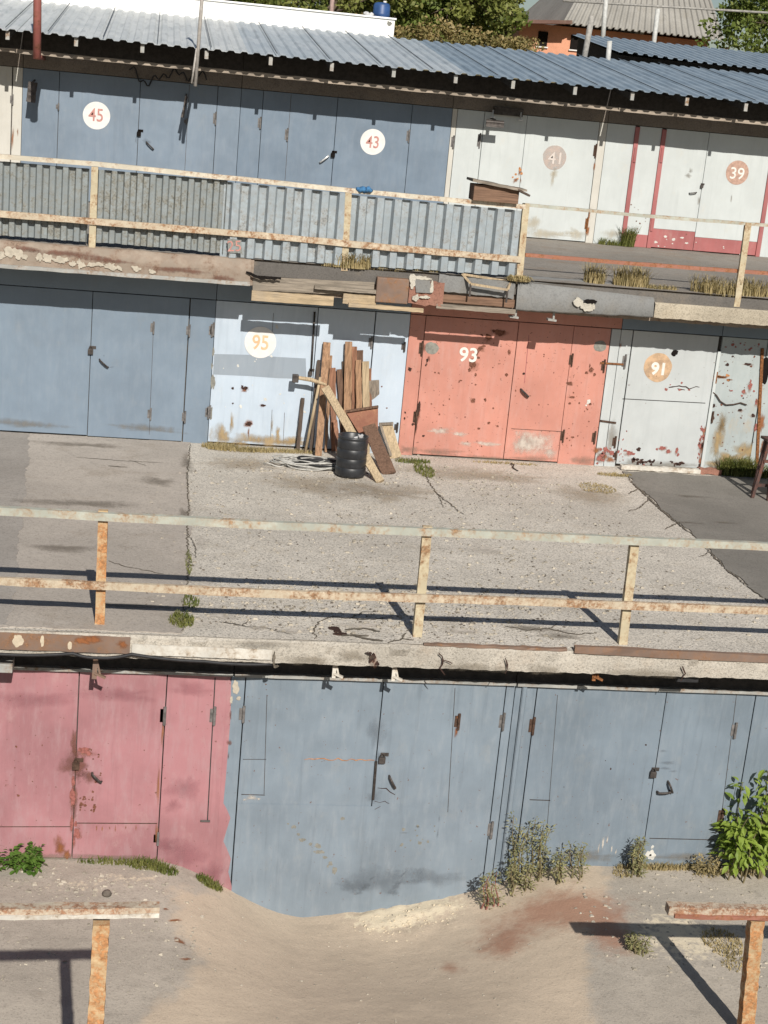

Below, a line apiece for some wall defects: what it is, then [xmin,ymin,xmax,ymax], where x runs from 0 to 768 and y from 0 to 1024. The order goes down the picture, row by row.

corrosion [16,247,121,262]
peeling [0,246,156,274]
peeling [718,341,760,405]
peeling [596,430,685,466]
crack [108,444,197,631]
crack [629,478,762,597]
corrosion [75,636,100,644]